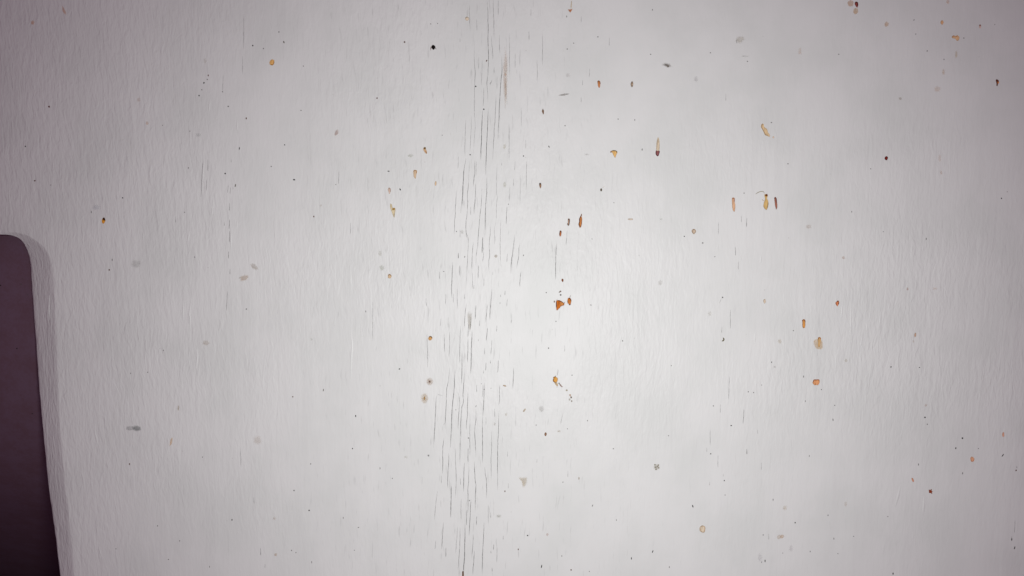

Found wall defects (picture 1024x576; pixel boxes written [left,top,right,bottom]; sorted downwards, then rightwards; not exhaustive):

crack [427,5,521,574]